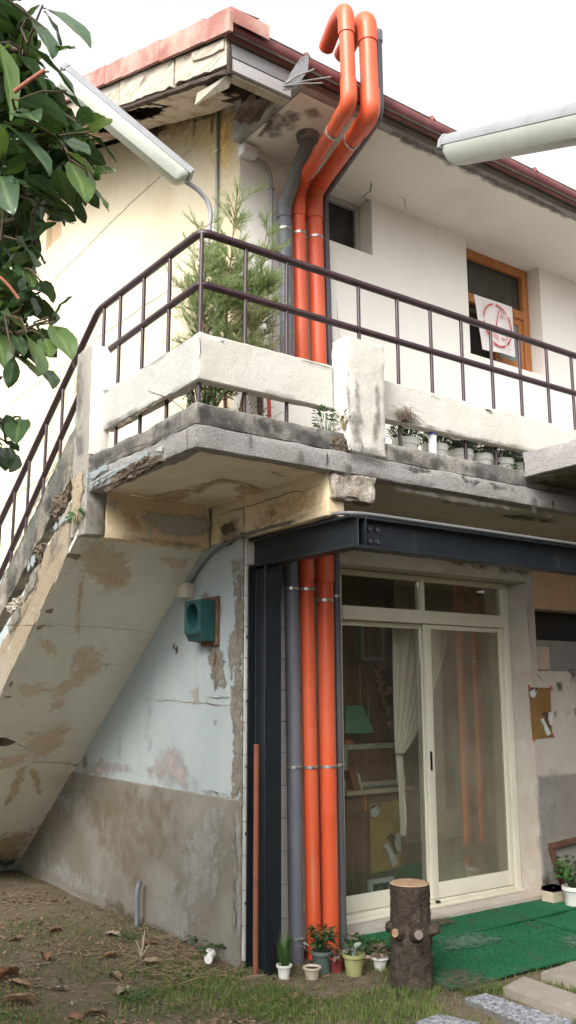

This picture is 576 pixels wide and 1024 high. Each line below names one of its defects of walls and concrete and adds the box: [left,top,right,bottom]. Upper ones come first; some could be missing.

leakage [89,438,134,465]
leakage [199,406,235,418]
crack [218,441,386,516]
leakage [345,388,382,477]
spalling [5,446,166,638]
peeling [142,512,246,546]
crack [139,656,227,705]
peeling [207,571,245,806]
leakage [50,807,223,942]